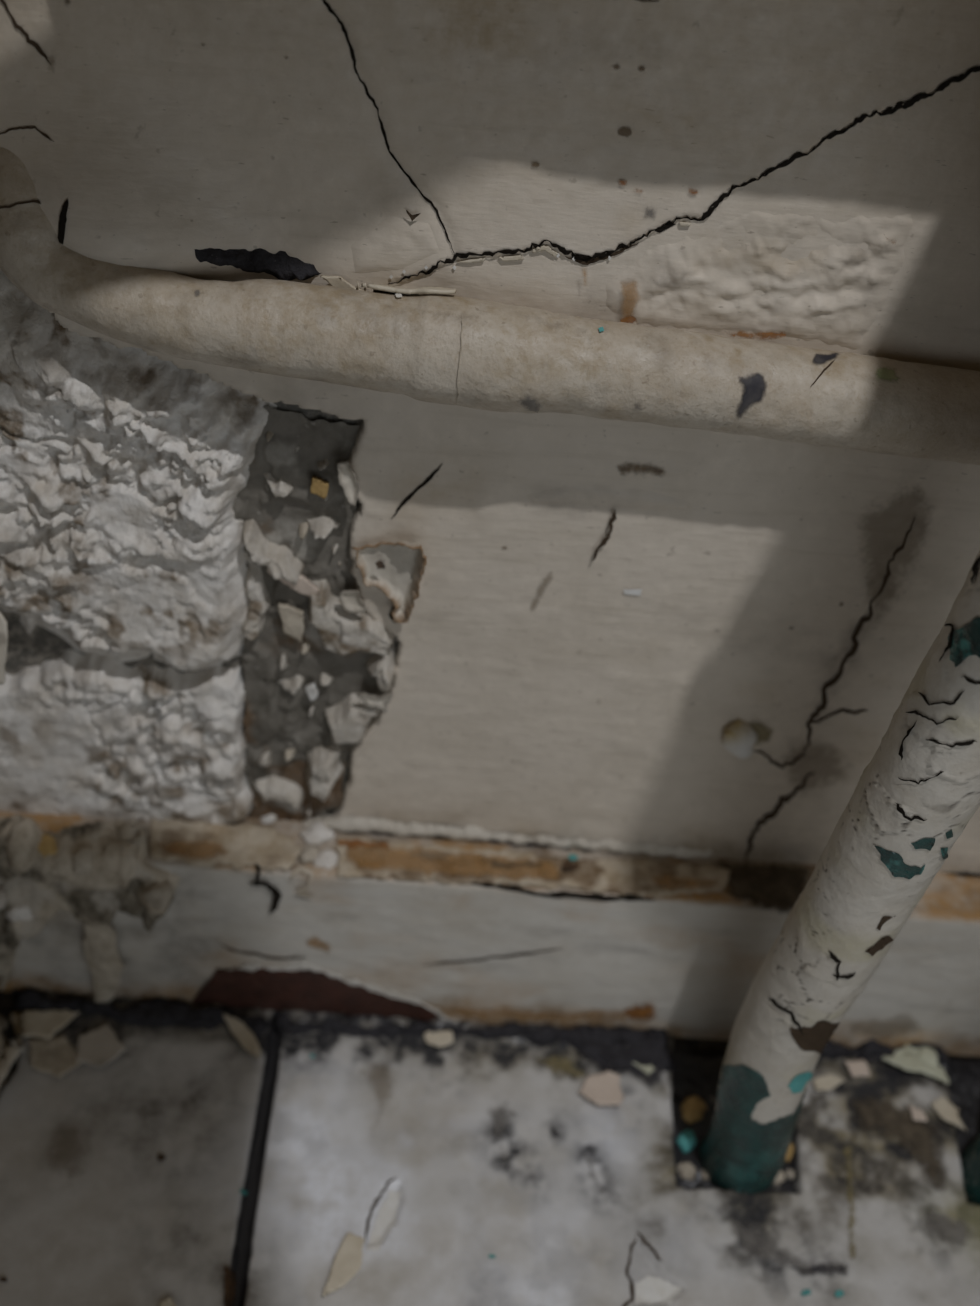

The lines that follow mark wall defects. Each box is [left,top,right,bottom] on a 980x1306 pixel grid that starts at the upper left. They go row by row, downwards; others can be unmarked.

crack [0,0,51,64]
crack [322,0,980,284]
flaking render [0,271,427,871]
crack [745,517,915,862]
crack [895,623,980,821]
peeling [875,829,953,879]
peeling [865,916,895,956]
leakage [539,1036,663,1087]
peeling [790,1021,839,1054]
peeling [788,1044,967,1131]
leakage [853,1099,945,1190]
leakage [734,1147,855,1297]